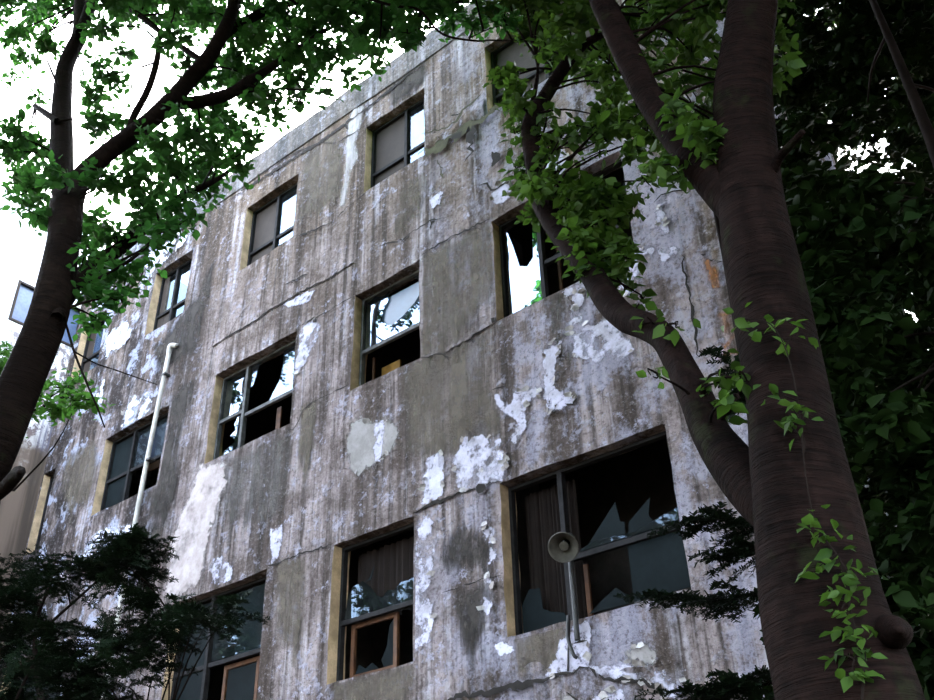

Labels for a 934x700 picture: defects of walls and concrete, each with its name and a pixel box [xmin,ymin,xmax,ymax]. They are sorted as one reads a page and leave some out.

crack [681,254,722,356]
flaking render [418,287,634,505]
flaking render [346,415,399,476]
peeling [269,525,283,564]
peeling [415,515,438,650]
water stain [442,528,489,573]
peeling [476,521,497,615]
water stain [457,585,488,663]
crack [448,666,685,700]
flaking render [545,621,686,700]